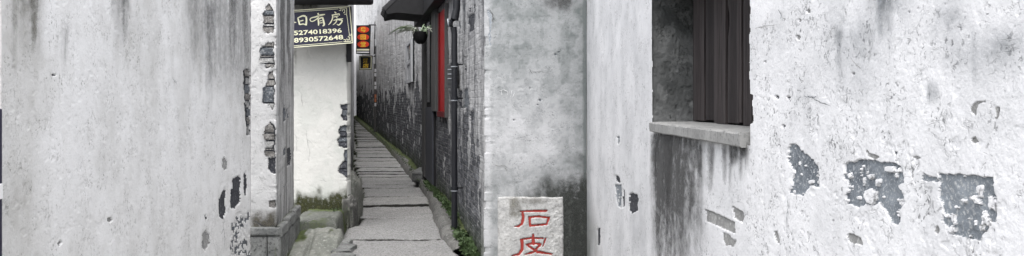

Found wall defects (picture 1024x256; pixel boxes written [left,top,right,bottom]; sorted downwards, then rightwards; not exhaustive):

flaking render [243,5,288,135]
spalling [202,156,250,256]
flaking render [337,104,348,177]
spalling [615,176,639,213]
water stain [652,134,747,256]
flaking render [705,207,745,246]
spalling [788,144,819,196]
spalling [844,150,904,224]
spalling [922,173,997,240]